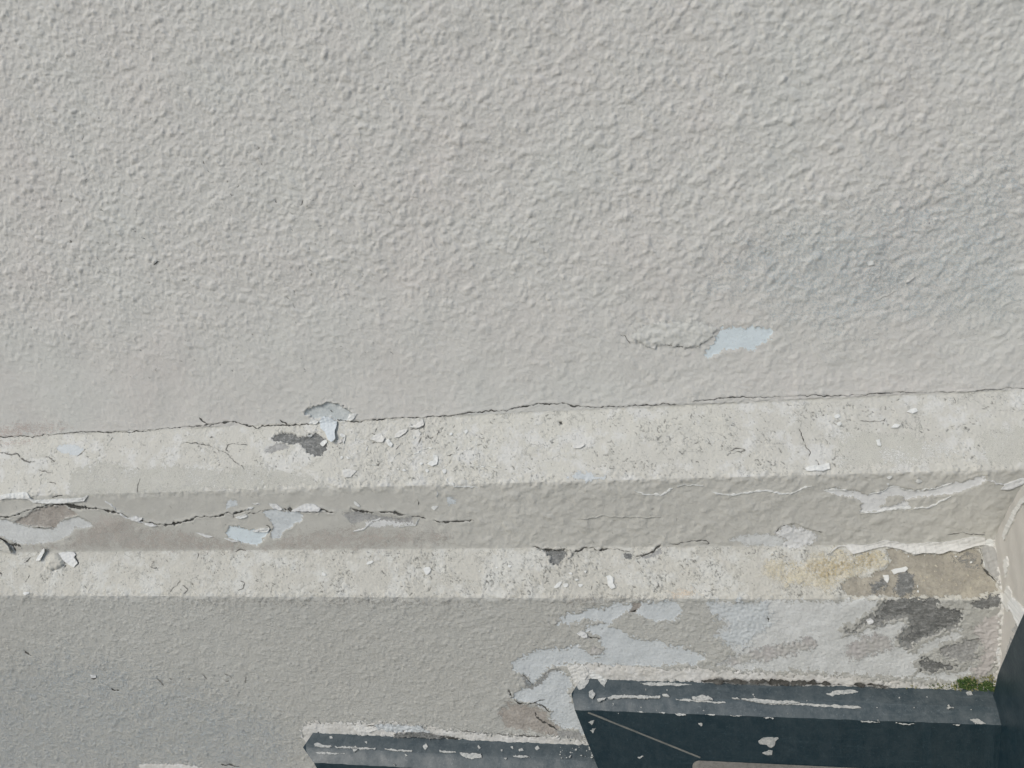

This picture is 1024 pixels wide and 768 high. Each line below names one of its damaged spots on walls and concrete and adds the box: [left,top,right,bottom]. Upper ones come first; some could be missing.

peeling [704,325,775,358]
spalling [266,402,478,510]
crack [337,387,1024,466]
spalling [0,492,92,571]
peeling [197,499,321,546]
peeling [343,501,419,532]
crack [534,540,709,557]
peeling [497,476,1024,740]